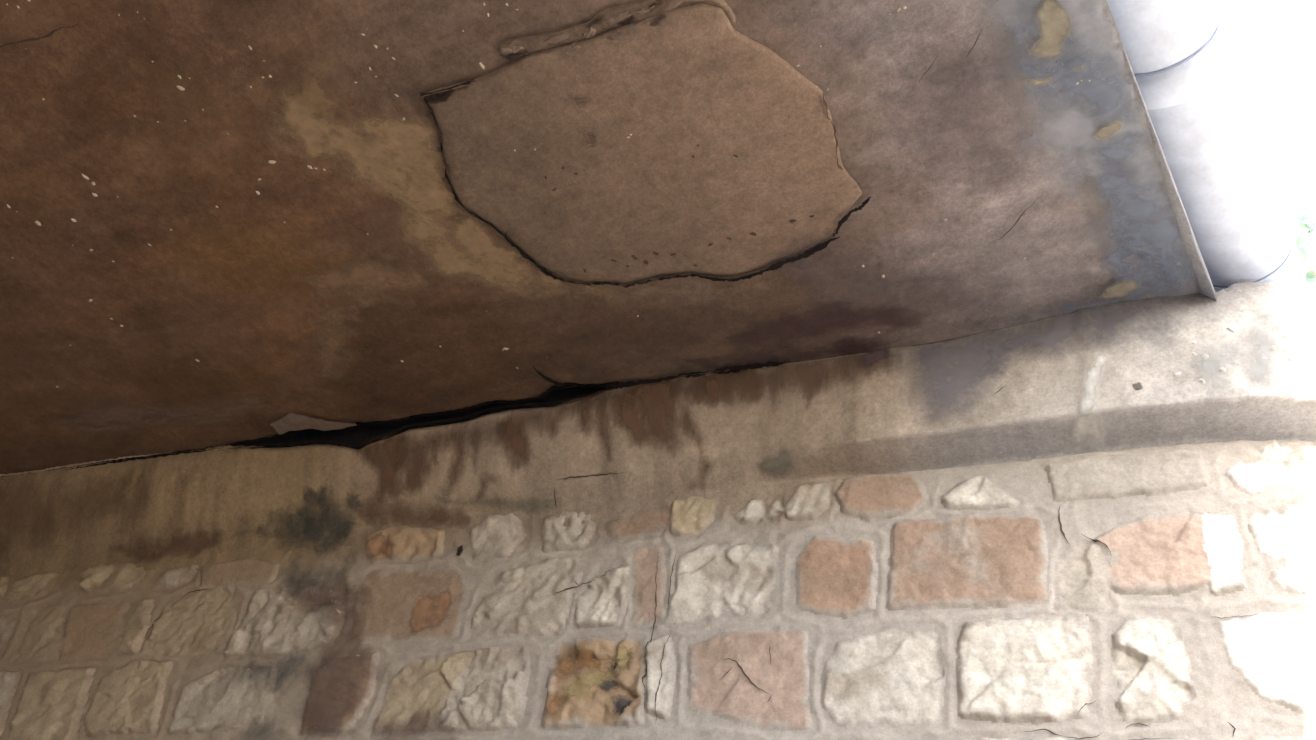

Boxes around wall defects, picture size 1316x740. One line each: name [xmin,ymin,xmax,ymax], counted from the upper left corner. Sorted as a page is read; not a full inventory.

peeling [270,413,357,435]
leakage [361,349,888,524]
leakage [916,291,1222,441]
crack [547,565,622,596]
crack [642,549,677,725]
crack [1058,507,1112,556]